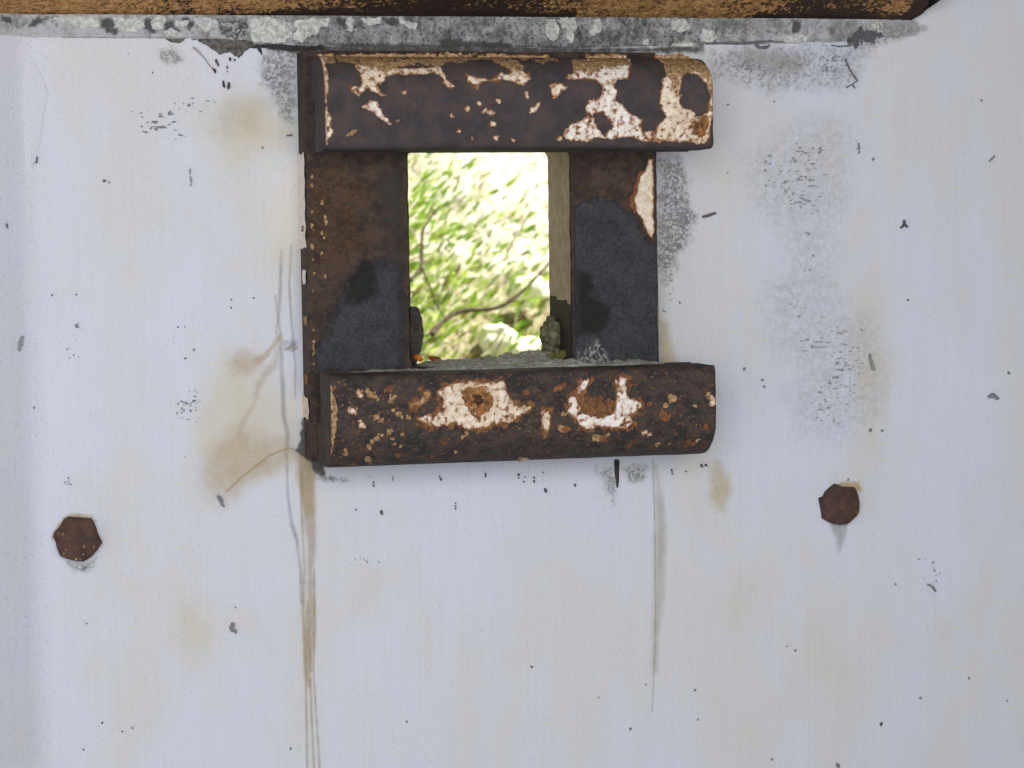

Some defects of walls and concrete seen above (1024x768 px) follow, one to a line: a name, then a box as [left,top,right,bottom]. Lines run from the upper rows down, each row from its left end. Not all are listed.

water stain [657,159,696,312]